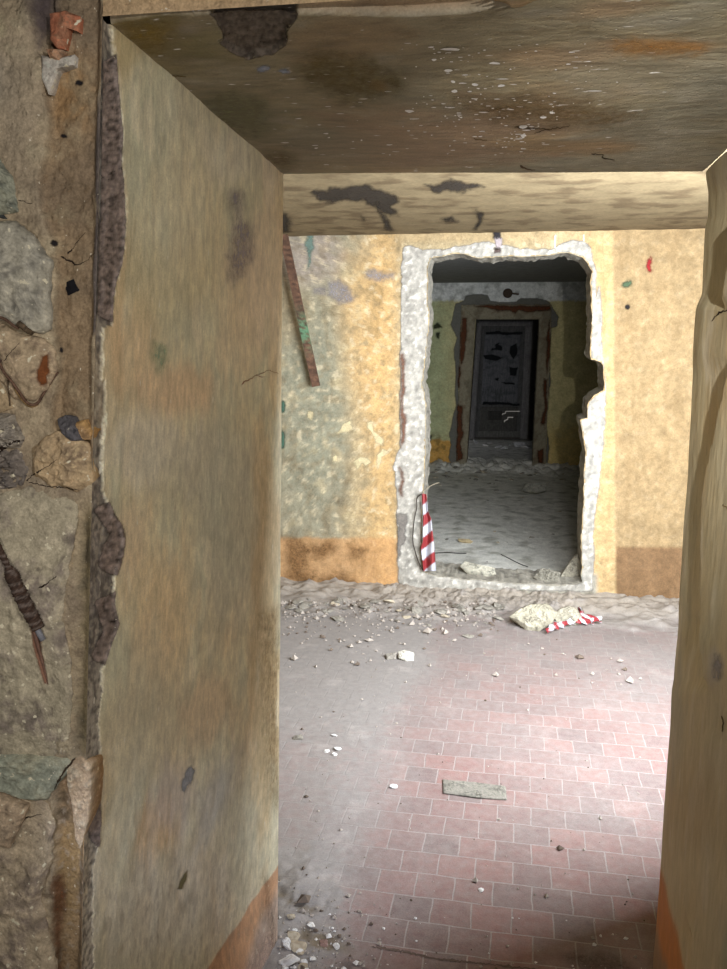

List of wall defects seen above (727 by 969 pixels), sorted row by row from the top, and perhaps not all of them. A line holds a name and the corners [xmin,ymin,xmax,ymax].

spalling [210,9,298,60]
spalling [354,240,606,592]
spalling [94,502,126,575]
spalling [91,591,120,665]
crack [371,946,535,969]